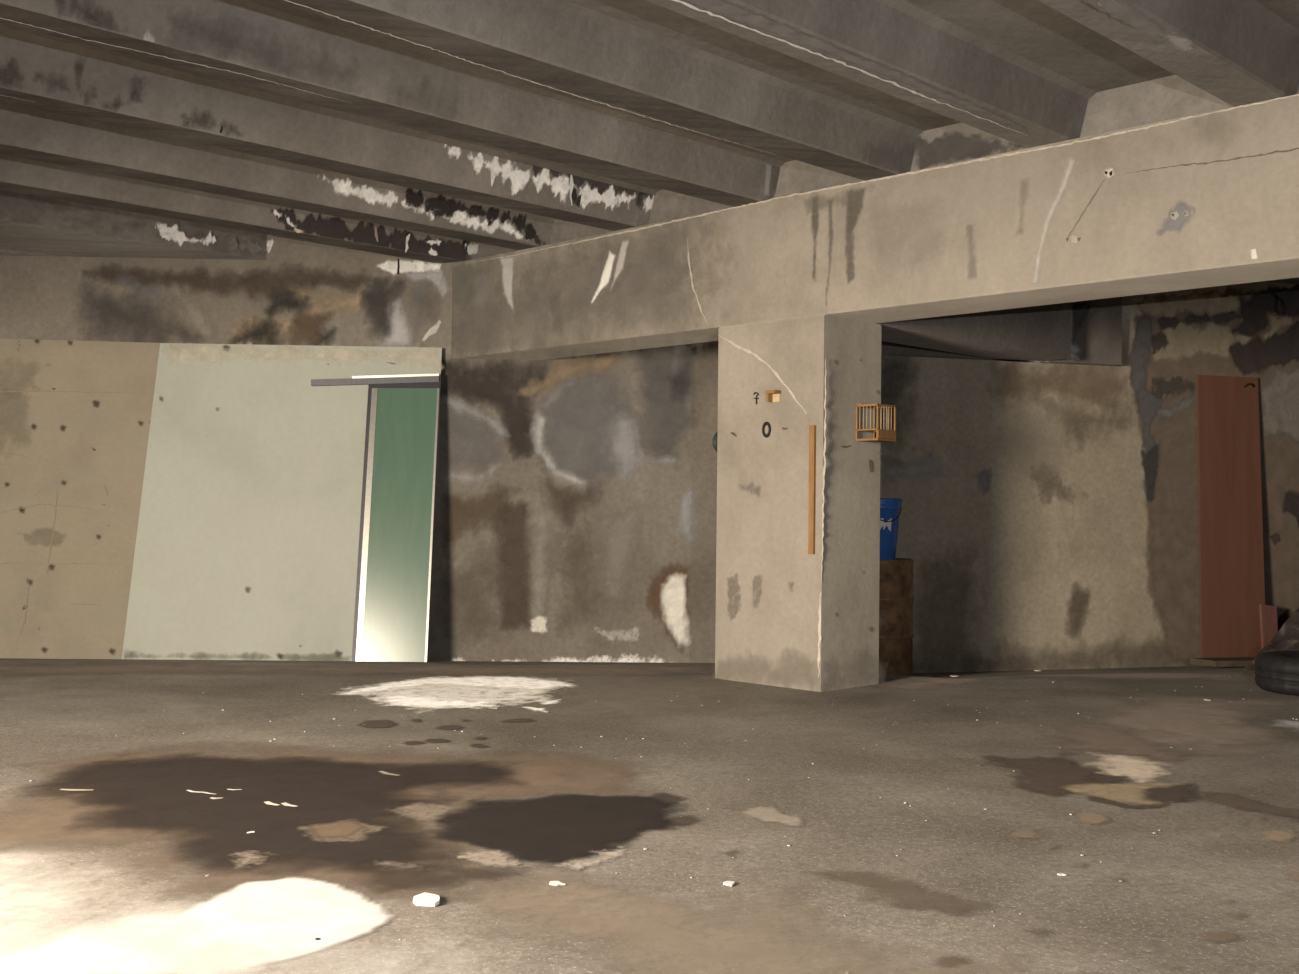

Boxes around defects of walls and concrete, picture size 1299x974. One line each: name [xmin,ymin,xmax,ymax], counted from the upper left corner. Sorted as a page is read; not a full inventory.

damp [88,0,1299,346]
crack [1067,148,1299,238]
damp [688,251,807,414]
damp [1152,284,1299,374]
damp [440,352,690,632]
damp [1142,446,1158,500]
damp [543,627,664,663]